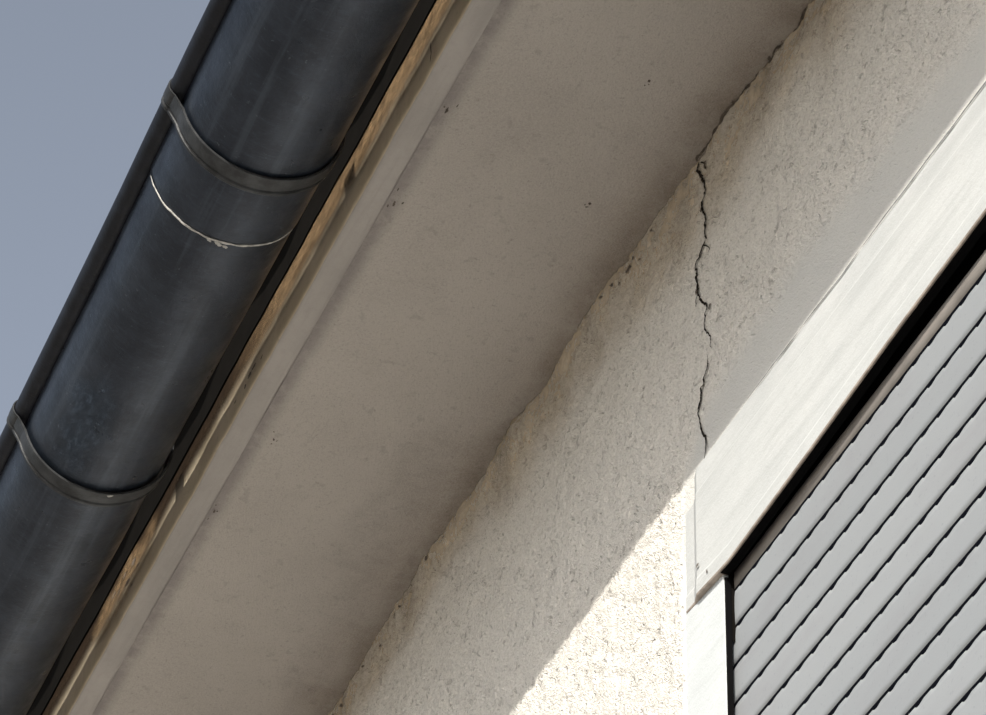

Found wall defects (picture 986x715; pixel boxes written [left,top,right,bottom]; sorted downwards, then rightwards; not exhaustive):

crack [695,0,815,458]